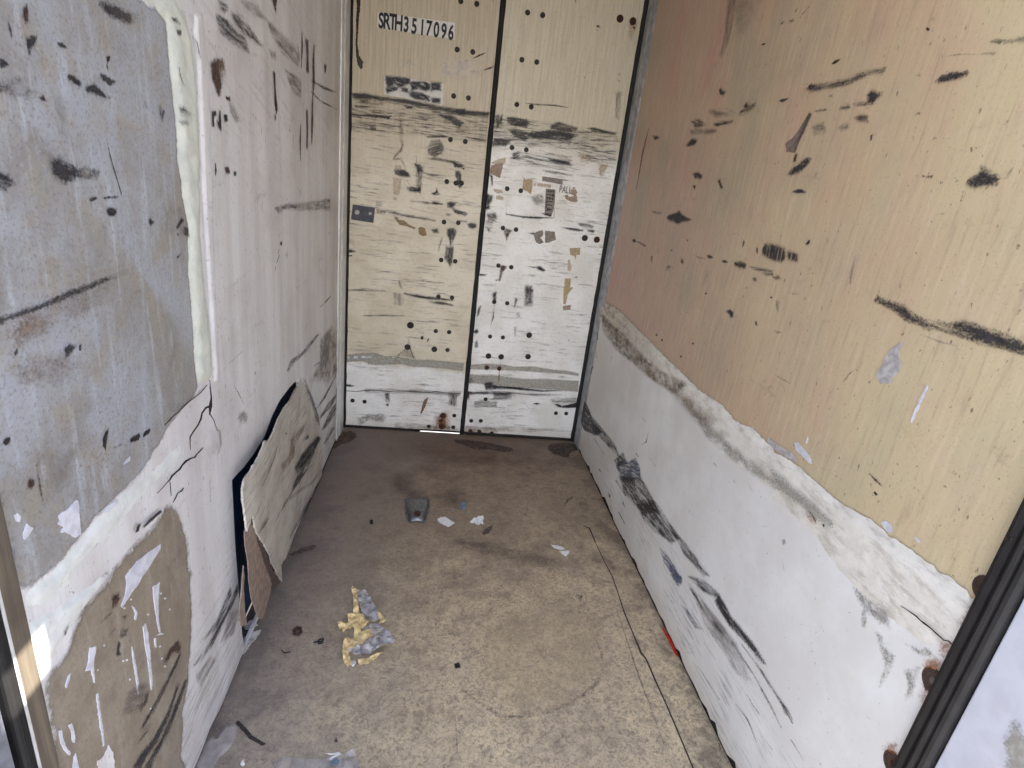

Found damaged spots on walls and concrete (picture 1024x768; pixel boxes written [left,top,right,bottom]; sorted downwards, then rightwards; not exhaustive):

peeling [877,342,903,384]
crack [157,380,218,502]
water stain [597,317,833,528]
peeling [767,436,812,464]
water stain [856,590,888,625]
peeling [46,507,192,768]
rust [924,643,951,690]
peeling [1004,723,1024,768]